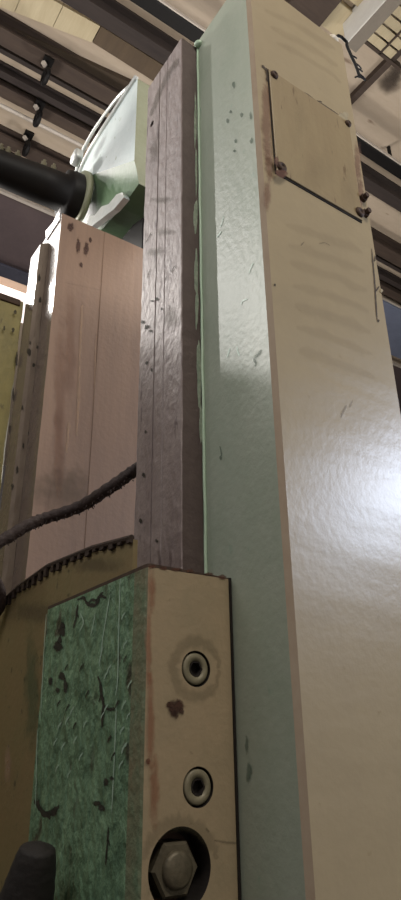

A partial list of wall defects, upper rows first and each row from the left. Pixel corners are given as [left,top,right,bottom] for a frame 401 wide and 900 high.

peeling [77,592,106,607]
spalling [53,622,65,652]
peeling [49,664,87,750]
peeling [34,799,59,820]